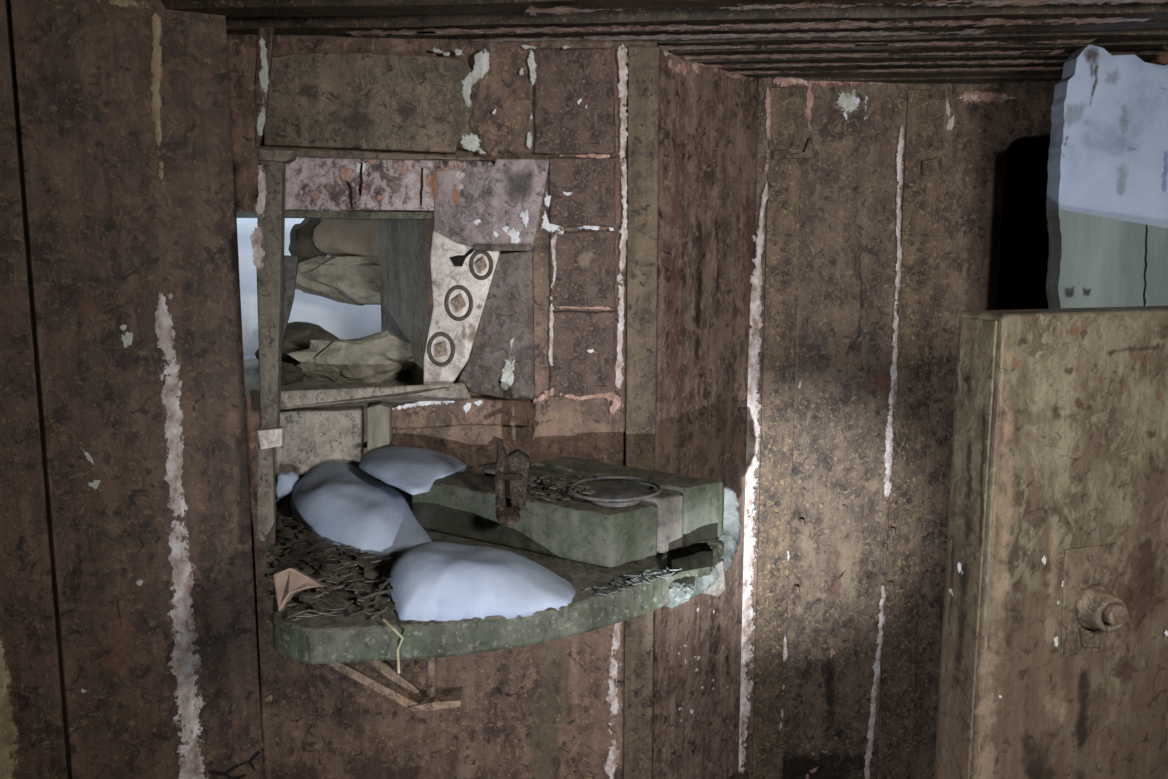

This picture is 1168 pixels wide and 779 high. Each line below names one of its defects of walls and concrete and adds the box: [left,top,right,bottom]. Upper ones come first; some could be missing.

peeling [338,0,1168,779]